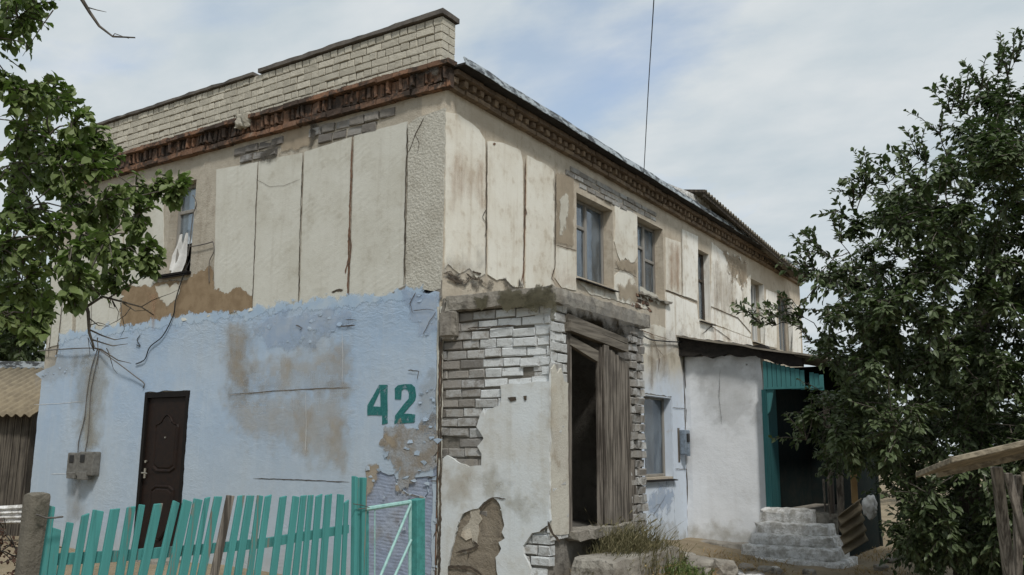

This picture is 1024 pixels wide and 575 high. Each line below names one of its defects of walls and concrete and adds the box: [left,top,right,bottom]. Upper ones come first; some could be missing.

peeling [119,266,253,327]
crack [332,136,355,327]
flaking render [555,166,657,246]
flaking render [365,388,504,575]